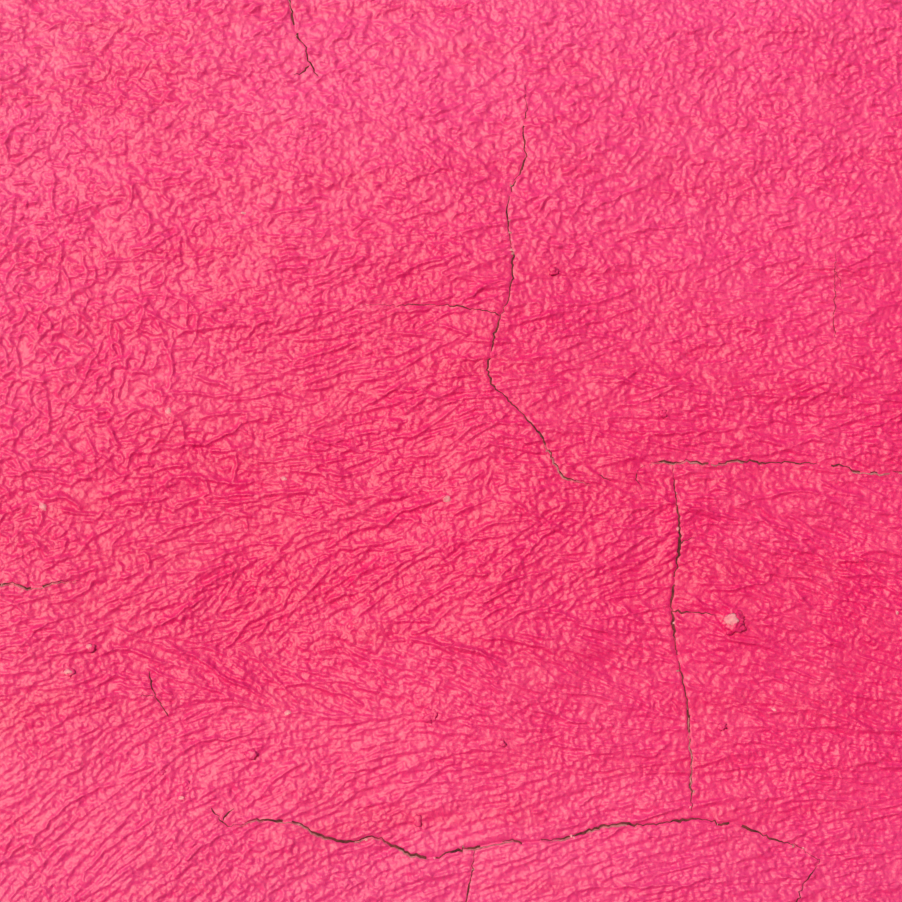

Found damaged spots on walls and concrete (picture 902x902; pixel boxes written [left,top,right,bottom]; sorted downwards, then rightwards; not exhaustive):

crack [288,0,318,76]
crack [366,88,611,485]
crack [833,251,842,338]
crack [0,580,78,591]
crack [211,459,902,902]